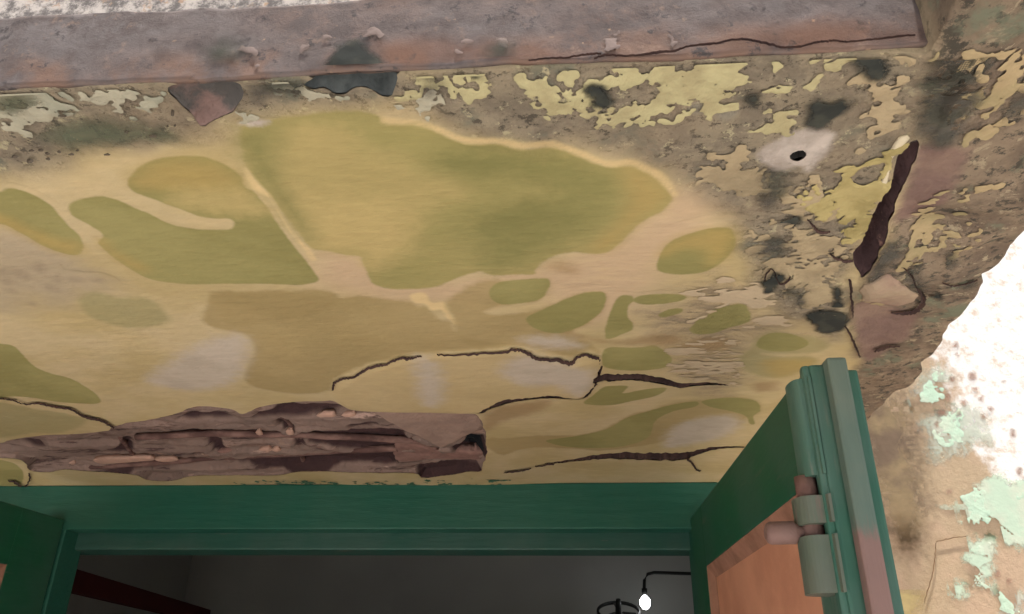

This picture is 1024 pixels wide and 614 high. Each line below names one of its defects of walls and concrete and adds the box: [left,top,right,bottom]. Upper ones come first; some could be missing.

crack [528,34,915,61]
peeling [0,82,260,163]
spalling [272,70,492,122]
peeling [513,63,752,130]
peeling [679,49,1024,366]
damp [0,83,854,457]
damp [0,459,28,486]
crack [0,398,114,429]
spalling [0,400,511,486]
crack [332,348,727,413]
crack [504,446,734,473]
peeling [936,473,1024,614]